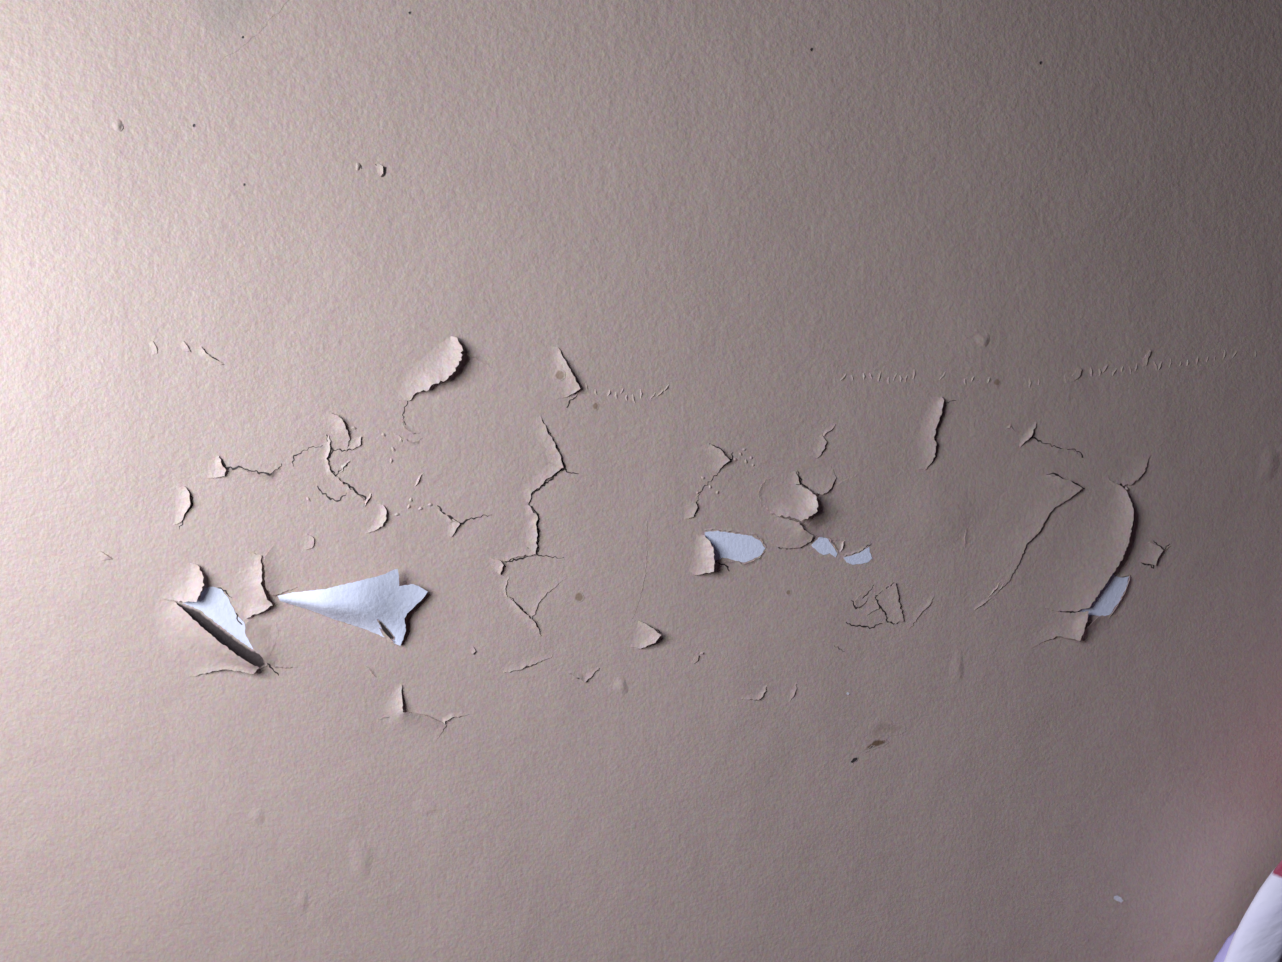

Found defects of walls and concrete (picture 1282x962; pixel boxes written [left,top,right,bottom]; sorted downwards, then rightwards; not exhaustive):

peeling [154,544,428,676]
crack [197,413,490,537]
peeling [393,336,492,446]
crack [487,416,600,682]
peeling [550,346,580,408]
peeling [630,621,662,649]
peeling [689,423,876,575]
peeling [916,397,956,470]
peeling [973,453,1171,649]